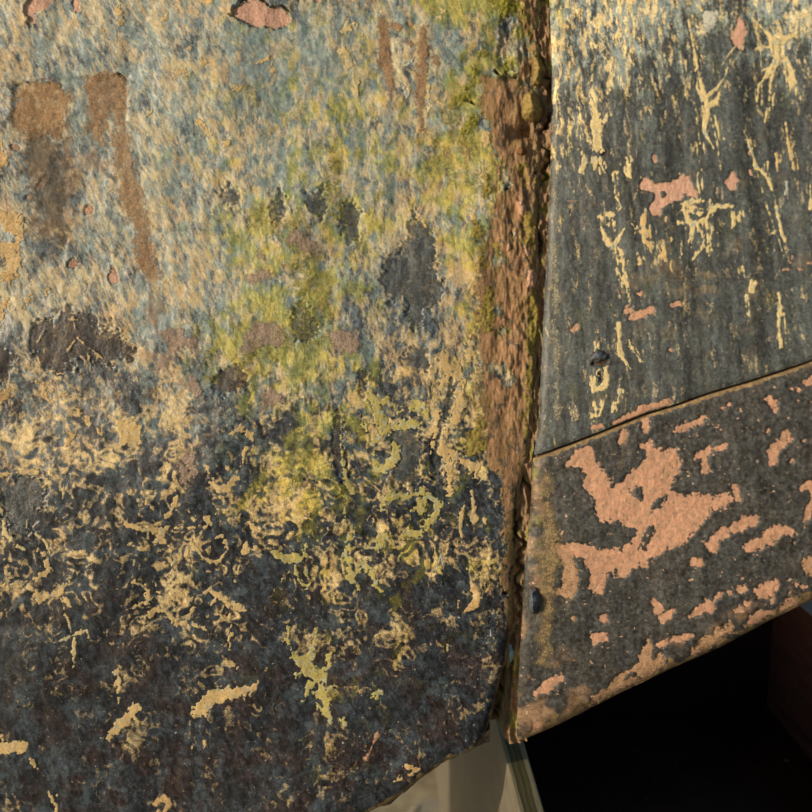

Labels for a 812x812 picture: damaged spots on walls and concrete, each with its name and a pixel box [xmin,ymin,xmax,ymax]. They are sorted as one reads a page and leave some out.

rust [9,79,74,142]
rust [376,16,440,131]
rust [82,66,161,280]
peeling [577,2,807,371]
peeling [0,464,90,668]
peeling [124,489,229,577]
peeling [126,579,247,651]
peeling [189,680,259,726]
peeling [284,620,348,727]
peeling [550,365,741,599]
peeling [586,555,812,708]
peeling [704,514,797,553]